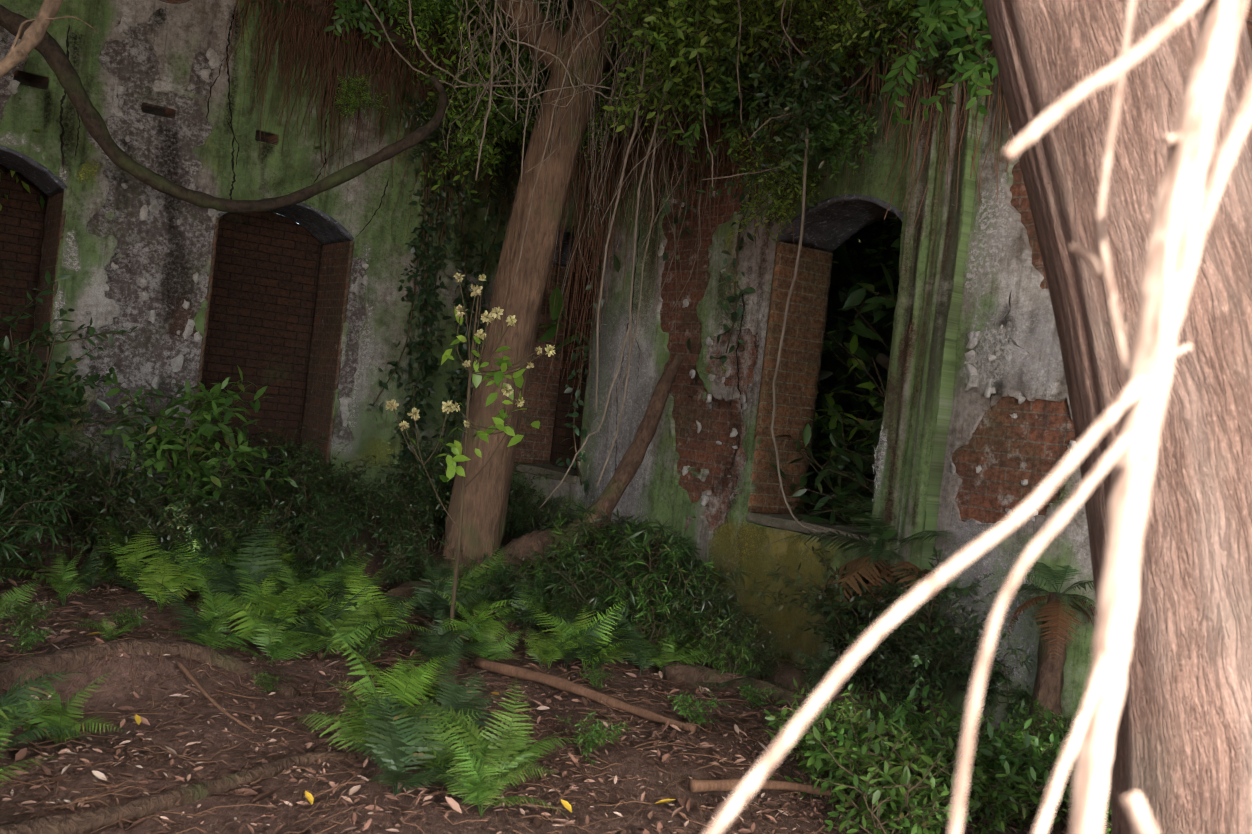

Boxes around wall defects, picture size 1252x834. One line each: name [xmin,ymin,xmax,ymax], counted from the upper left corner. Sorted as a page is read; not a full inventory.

flaking render [0,26,29,122]
damp [920,38,964,160]
flaking render [81,9,222,437]
flaking render [1010,162,1048,289]
damp [53,291,65,337]
flaking render [658,142,758,534]
damp [873,321,925,522]
flaking render [950,392,1076,523]